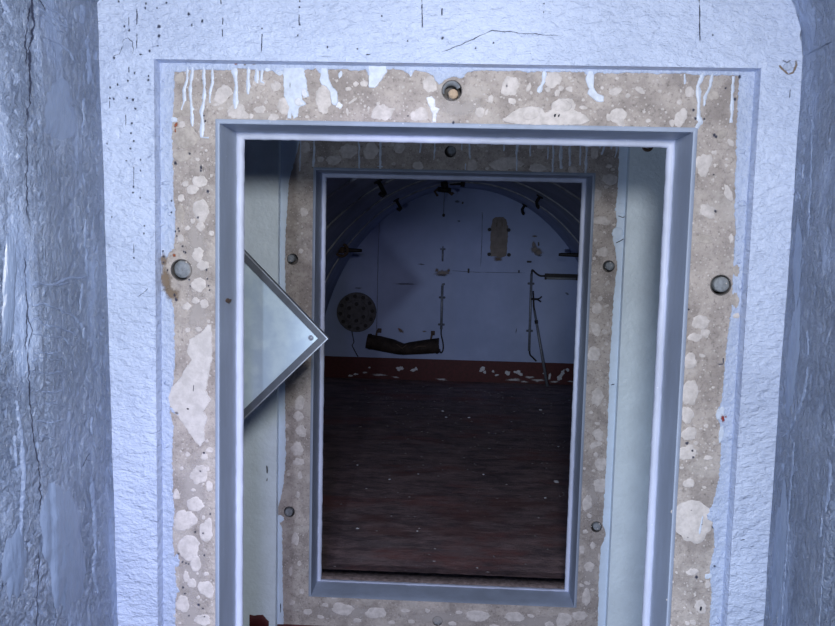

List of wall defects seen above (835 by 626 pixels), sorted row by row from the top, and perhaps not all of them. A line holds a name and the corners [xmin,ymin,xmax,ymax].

crack [445,30,542,51]
crack [24,0,45,216]
water stain [188,67,214,139]
water stain [246,68,264,94]
water stain [693,73,713,120]
water stain [725,75,741,123]
crack [24,259,42,509]
crack [34,552,42,626]